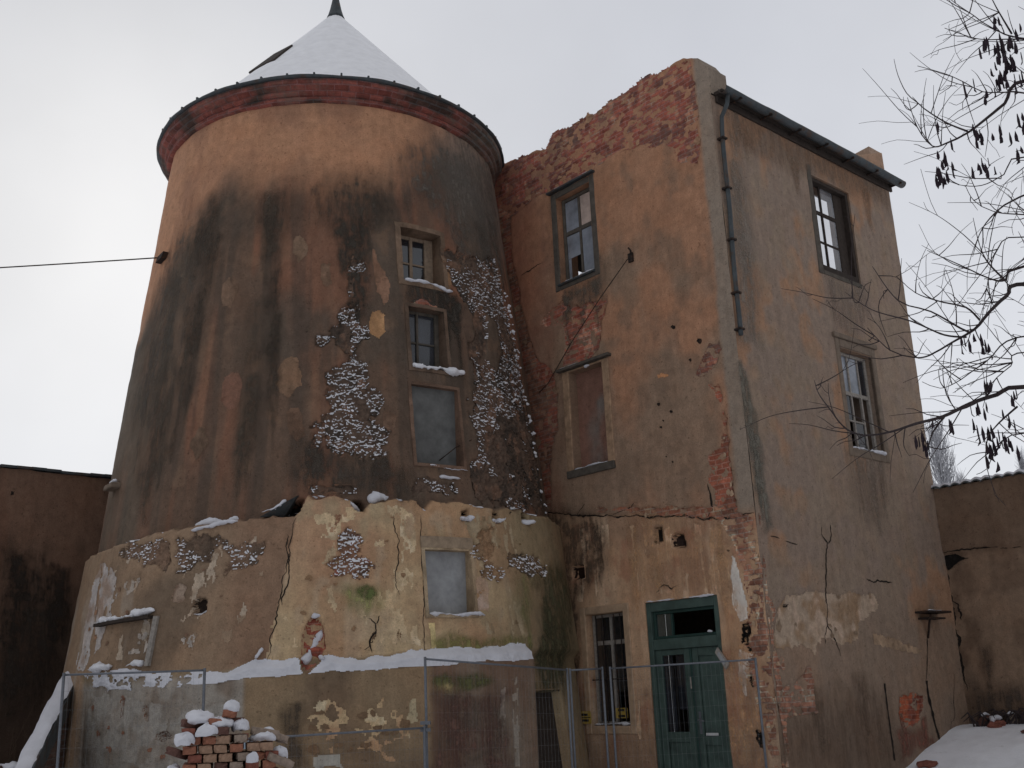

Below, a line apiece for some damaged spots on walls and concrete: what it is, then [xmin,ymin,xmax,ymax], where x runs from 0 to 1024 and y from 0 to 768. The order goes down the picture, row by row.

spalling [310,249,392,460]
leakage [406,285,463,370]
spalling [440,61,700,639]
peeling [76,532,266,671]
crack [267,520,295,659]
spalling [292,611,326,673]
crack [365,616,379,651]
peeling [310,485,437,649]
peeling [628,338,879,768]
crack [821,525,841,656]
crack [926,546,1021,739]